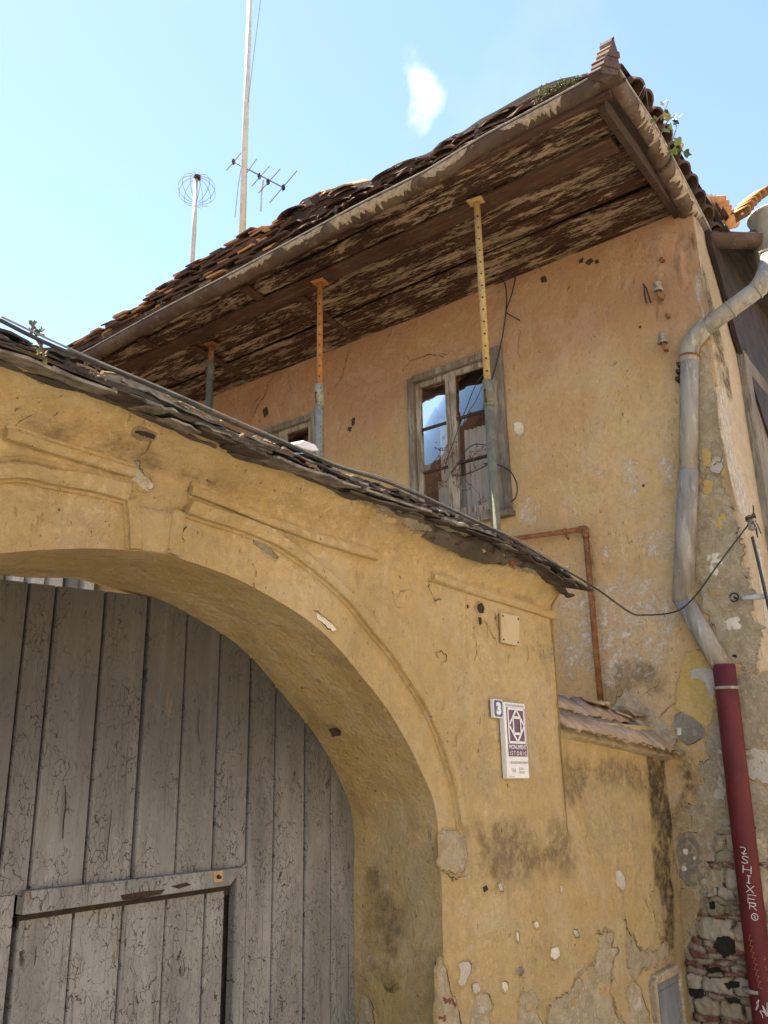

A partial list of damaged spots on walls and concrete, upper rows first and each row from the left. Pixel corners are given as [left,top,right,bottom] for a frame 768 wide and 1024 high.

spalling [314,612,337,635]
spalling [694,352,768,846]
leakage [649,757,674,953]
spalling [671,649,730,954]
spalling [433,885,670,1024]